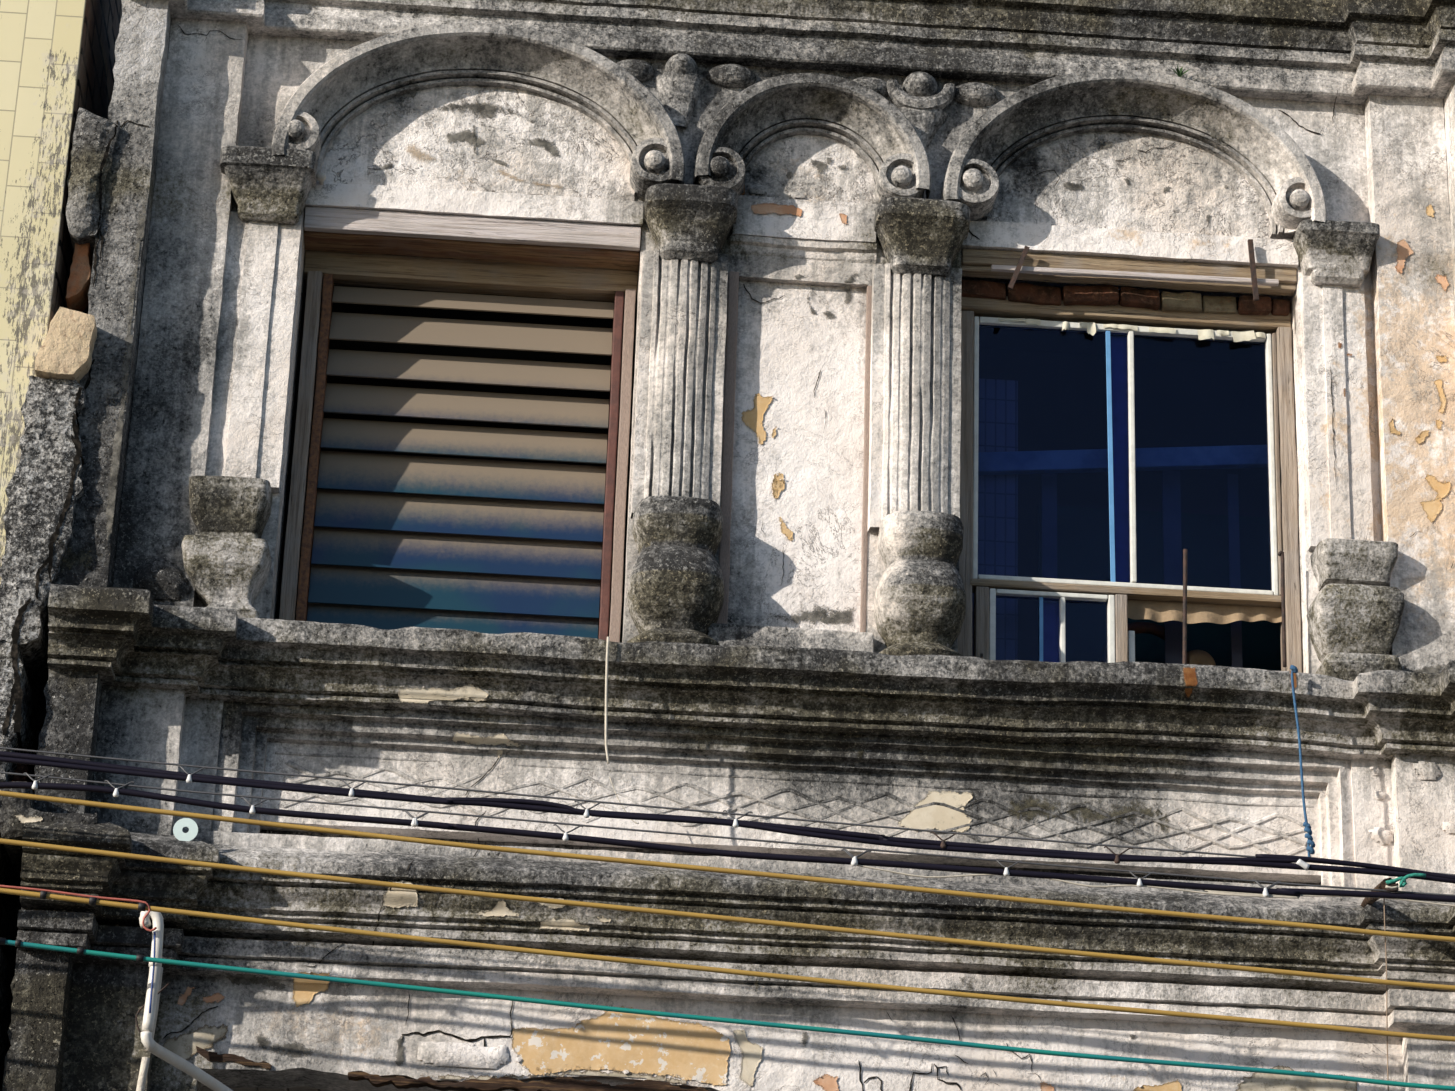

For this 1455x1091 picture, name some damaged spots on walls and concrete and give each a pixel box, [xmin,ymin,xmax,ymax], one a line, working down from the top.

leakage [59,186,148,573]
peeling [741,393,777,444]
peeling [772,473,785,498]
crack [2,359,95,753]
peeling [398,684,489,704]
rust [1183,667,1198,697]
peeling [898,790,973,832]
leakage [1008,795,1170,833]
crack [402,995,513,1047]
peeling [348,1006,763,1091]
crack [858,1016,1042,1091]
spalling [1235,1065,1357,1091]